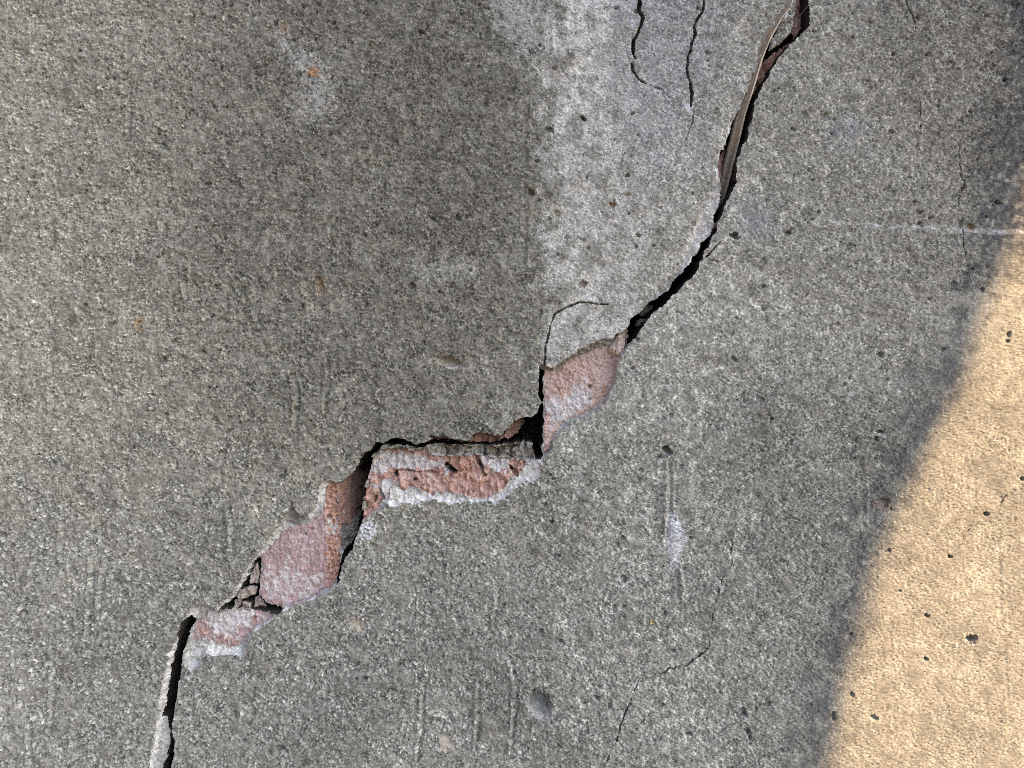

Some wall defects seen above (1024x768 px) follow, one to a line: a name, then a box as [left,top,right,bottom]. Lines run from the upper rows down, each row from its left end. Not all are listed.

crack [626,0,810,344]
spalling [184,328,629,671]
crack [337,302,608,585]
crack [149,556,283,768]
crack [604,534,735,767]